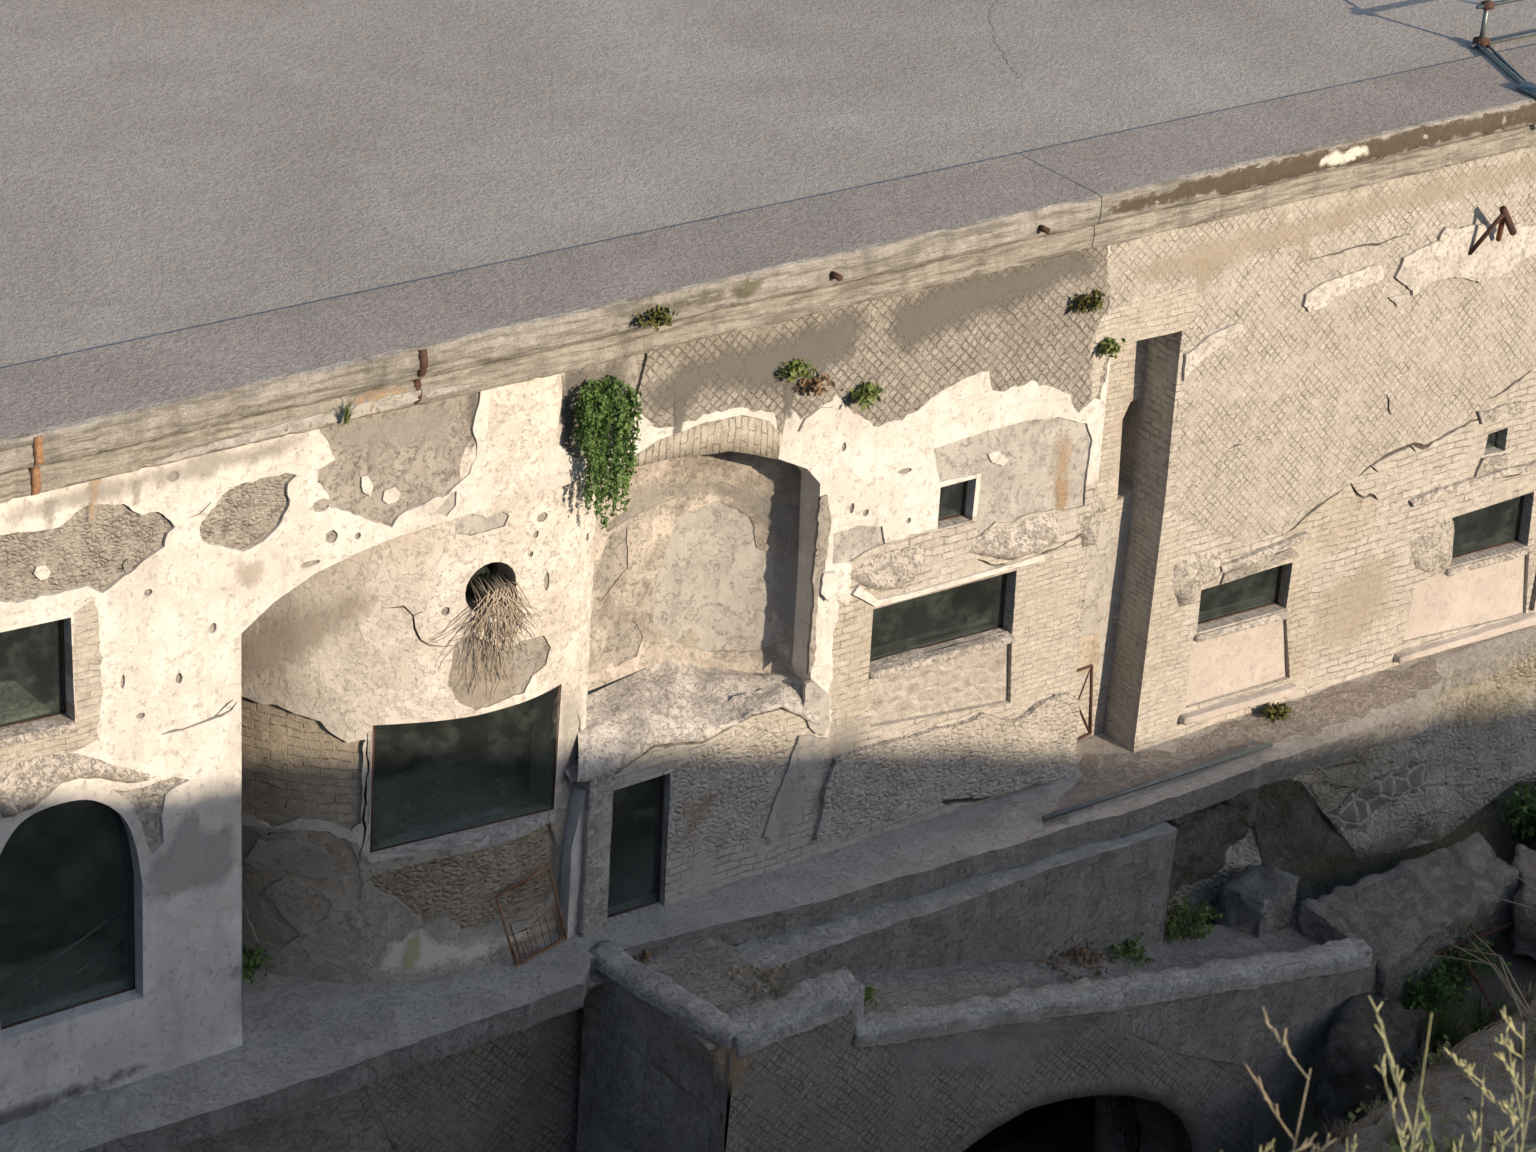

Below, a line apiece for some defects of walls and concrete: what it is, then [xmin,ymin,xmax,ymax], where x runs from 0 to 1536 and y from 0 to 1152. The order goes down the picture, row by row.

peeling [1302,223,1536,312]
peeling [1182,323,1244,382]
peeling [798,406,833,432]
flaking render [153,382,508,550]
crack [1308,419,1475,513]
peeling [1409,453,1536,507]
flaking render [0,504,173,601]
peeling [1220,531,1312,585]
crack [403,606,430,645]
flaking render [241,697,555,946]